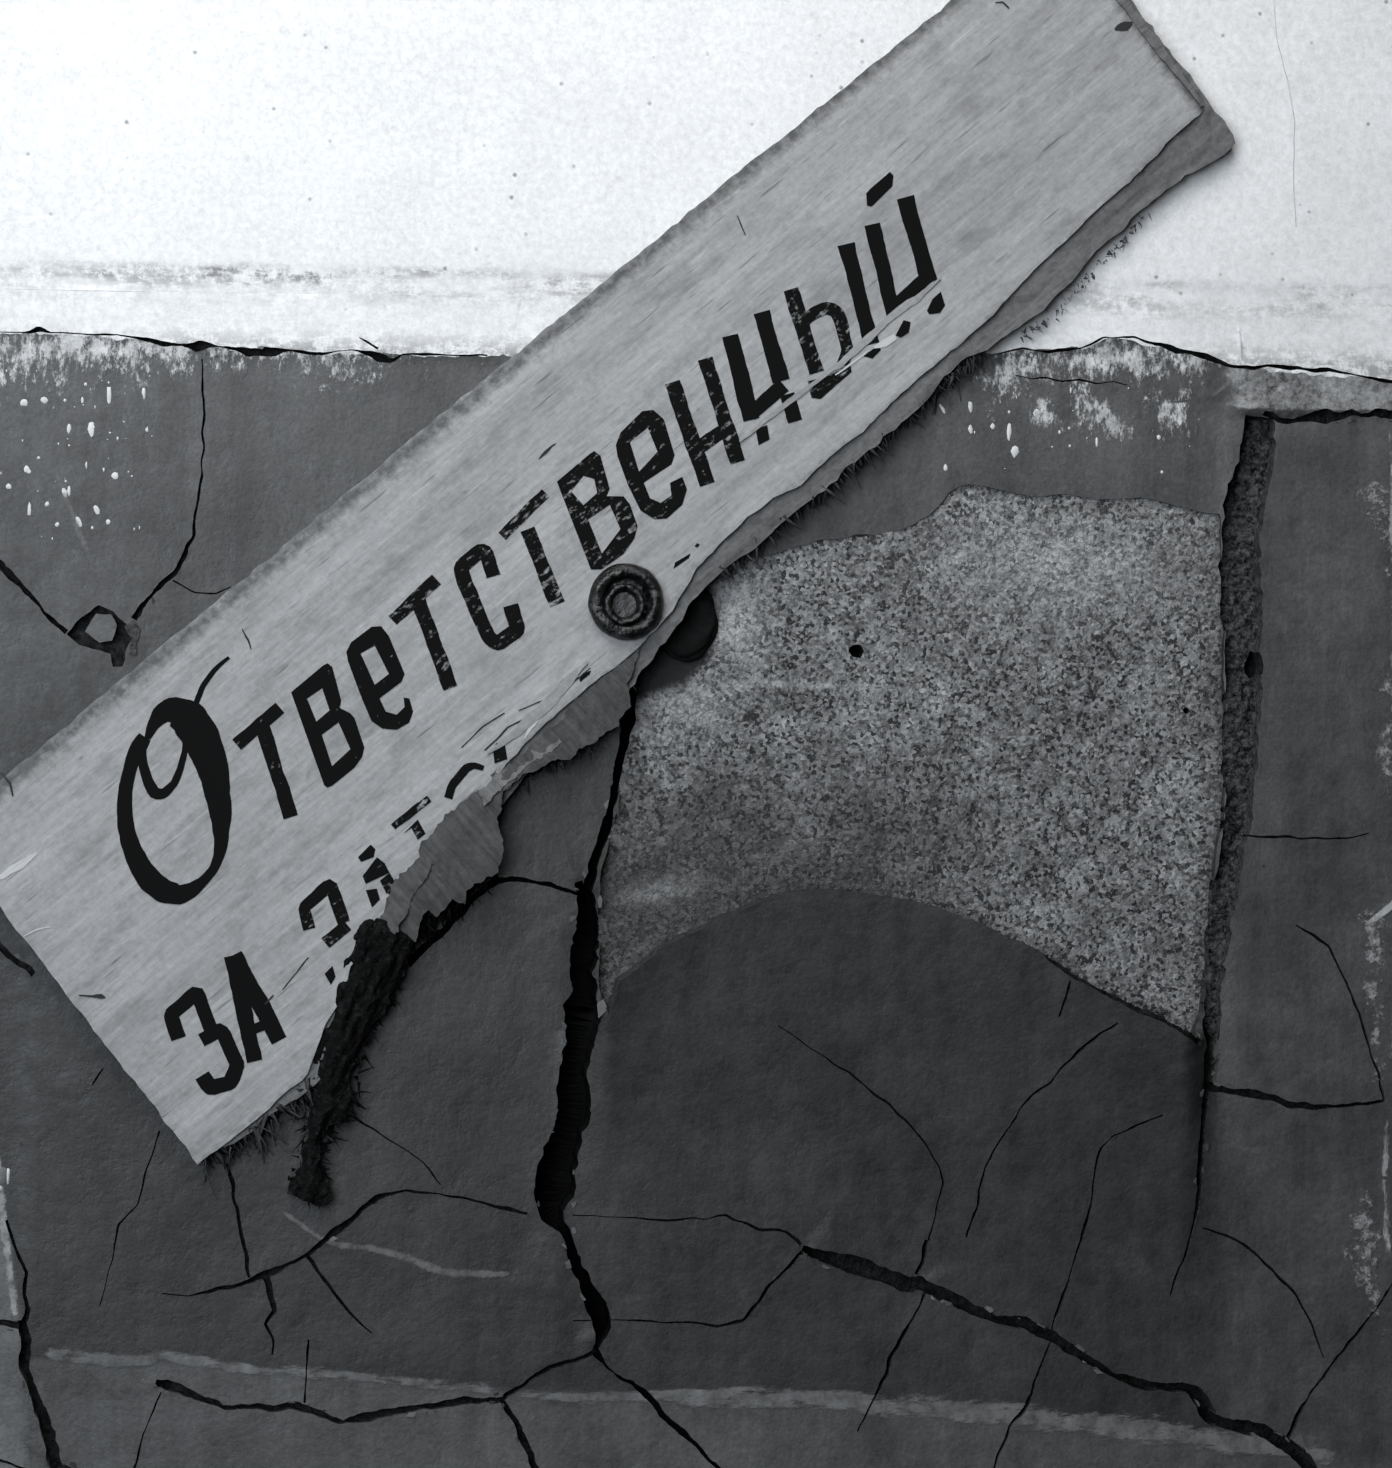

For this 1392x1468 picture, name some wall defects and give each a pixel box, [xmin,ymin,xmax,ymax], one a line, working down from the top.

crack [0,559,68,634]
crack [0,326,487,621]
spalling [597,484,1227,1038]
crack [0,942,35,977]
crack [133,673,1392,1468]
crack [99,1131,160,1306]
crack [0,1219,77,1468]